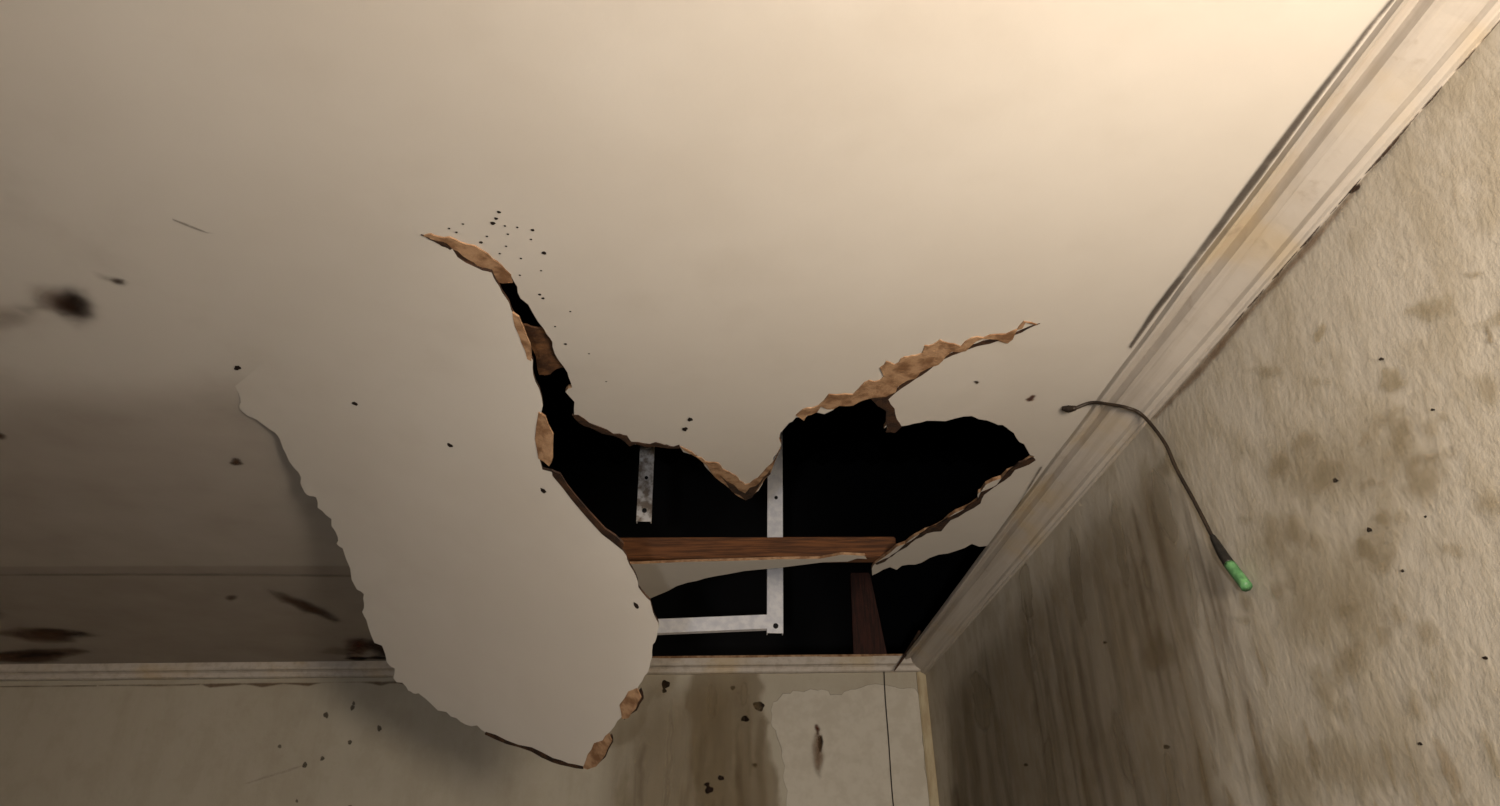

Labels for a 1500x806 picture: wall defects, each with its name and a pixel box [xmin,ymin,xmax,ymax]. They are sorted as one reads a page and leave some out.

leakage [51,295,85,315]
peeling [512,311,564,375]
spalling [871,396,902,433]
peeling [535,412,554,466]
spalling [572,414,781,501]
spalling [875,457,1036,565]
leakage [0,629,86,662]
leakage [347,640,386,660]
peeling [620,688,644,720]
leakage [741,701,765,722]
peeling [583,733,613,770]
spalling [815,725,823,769]